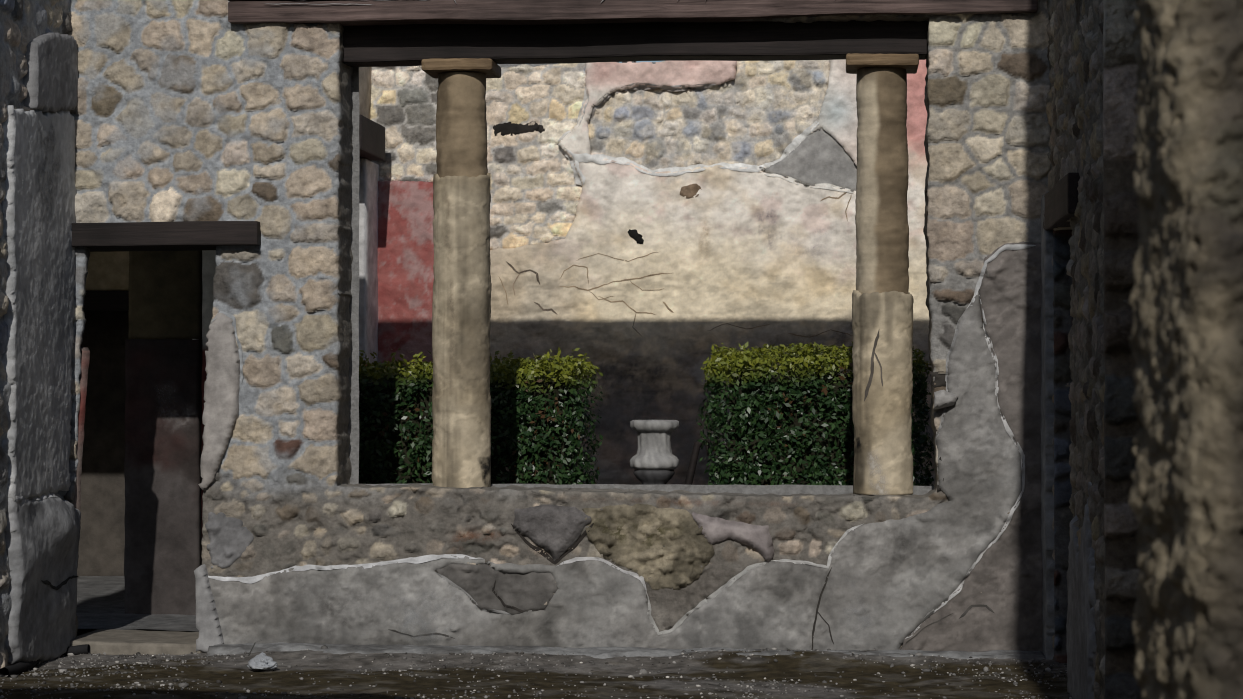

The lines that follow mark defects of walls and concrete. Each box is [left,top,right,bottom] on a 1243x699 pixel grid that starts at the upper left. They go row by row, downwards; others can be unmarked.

peeling [370,66,438,182]
peeling [485,60,857,250]
crack [499,252,674,335]
crack [709,323,883,401]
crack [900,604,994,650]